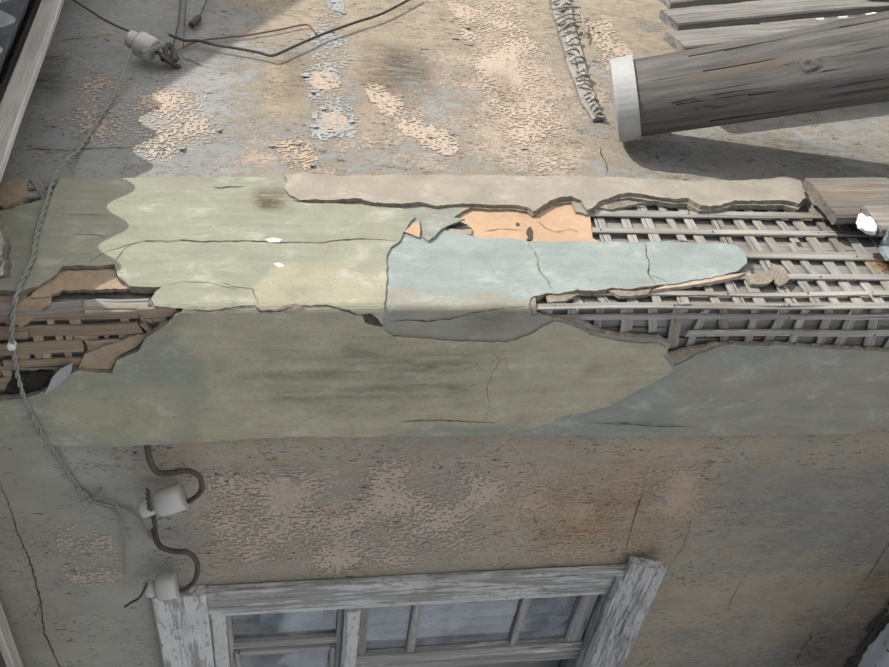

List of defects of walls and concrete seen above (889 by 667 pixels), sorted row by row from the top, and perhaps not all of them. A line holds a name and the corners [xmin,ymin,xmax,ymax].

spalling [404,200,645,242]
crack [166,281,530,325]
spalling [609,263,790,299]
spalling [0,269,178,395]
crack [0,484,60,667]